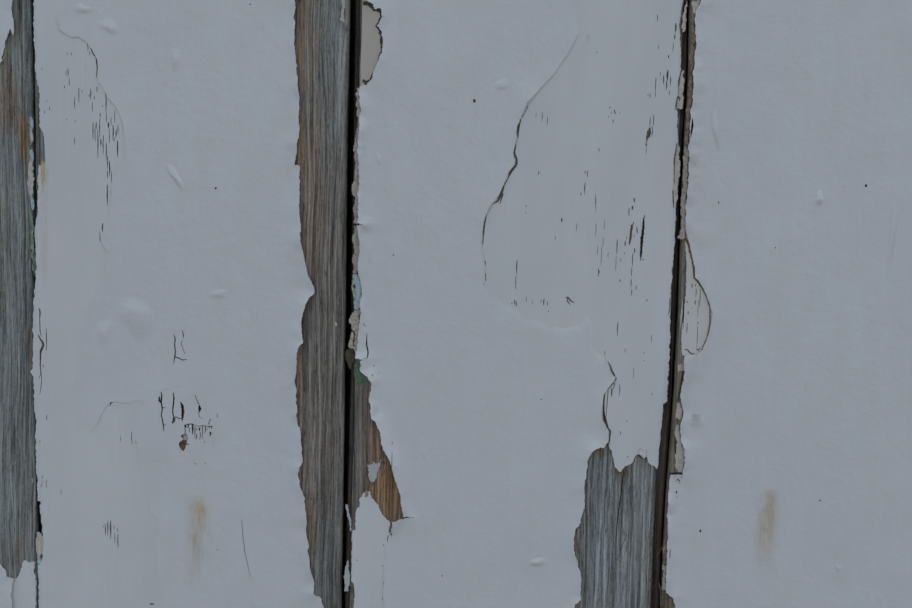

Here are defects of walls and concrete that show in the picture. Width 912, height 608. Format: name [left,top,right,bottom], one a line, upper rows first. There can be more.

crack [482,106,528,285]
peeling [0,0,164,608]
crack [173,331,187,364]
peeling [160,330,204,369]
peeling [158,389,216,469]
crack [158,392,218,431]
peeling [294,0,405,608]
peeling [481,0,712,608]